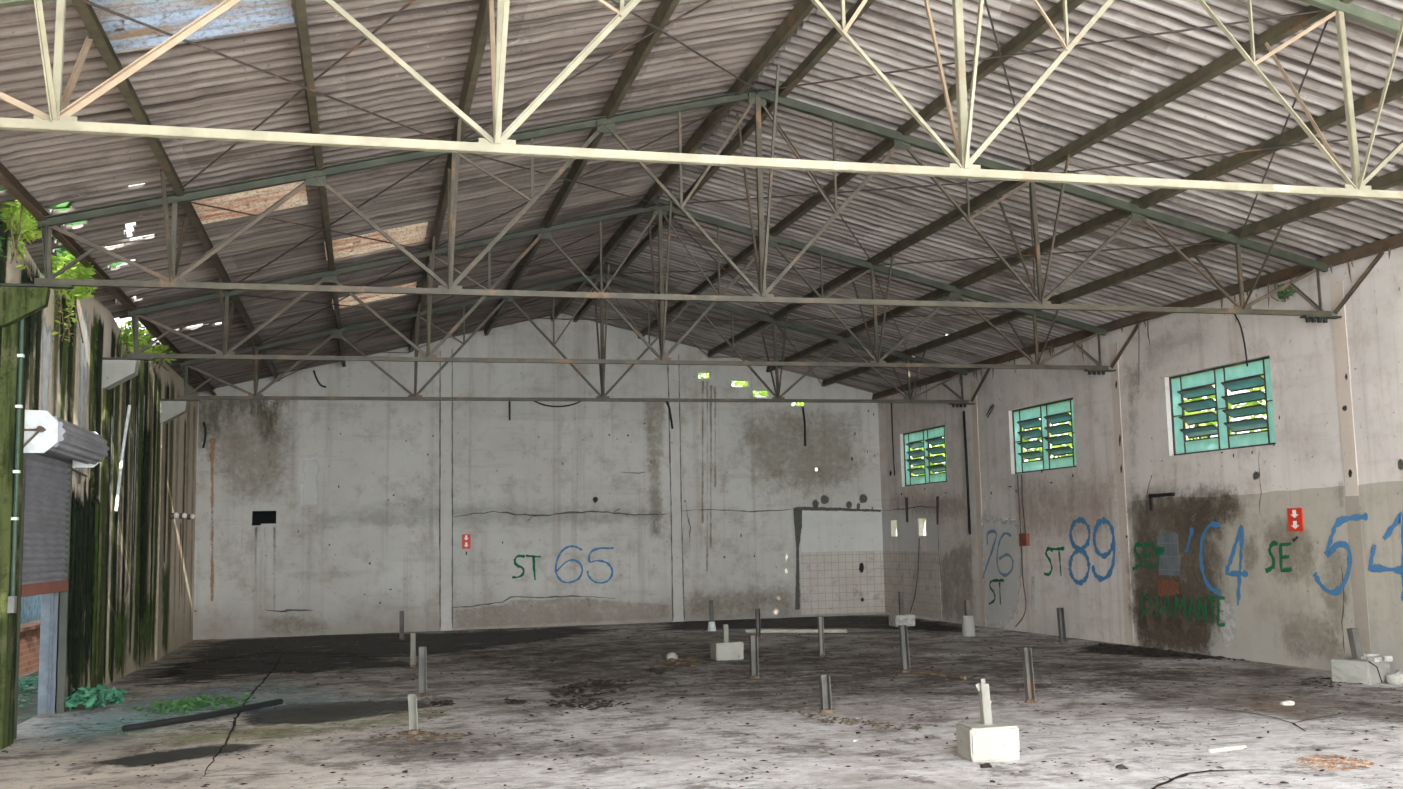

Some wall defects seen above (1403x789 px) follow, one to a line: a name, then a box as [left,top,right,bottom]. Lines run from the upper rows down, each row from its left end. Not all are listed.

water stain [1081,495,1238,659]
crack [203,653,287,777]